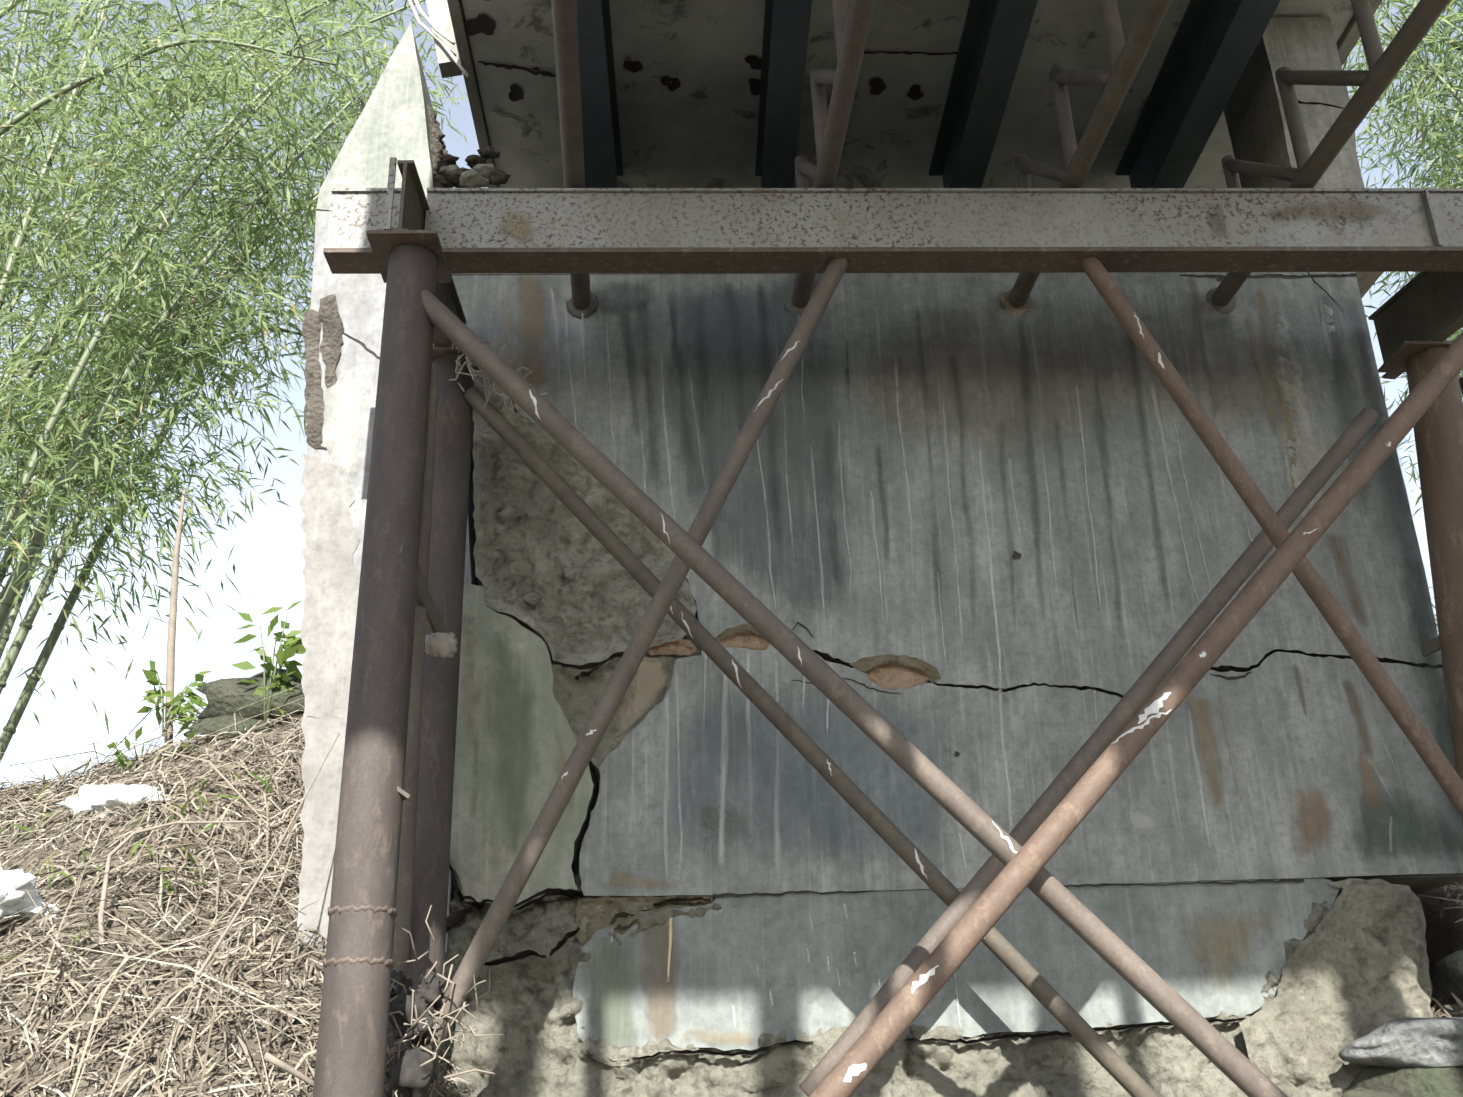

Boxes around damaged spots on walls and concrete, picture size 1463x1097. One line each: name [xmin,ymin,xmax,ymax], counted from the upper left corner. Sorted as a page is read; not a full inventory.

peeling [297,294,360,952]
spalling [472,384,675,741]
crack [575,655,623,681]
spalling [591,579,697,769]
damp [682,288,801,492]
damp [721,330,844,597]
crack [792,622,1152,698]
crack [1210,649,1443,680]
crack [446,765,599,966]
spalling [576,895,713,948]
spalling [1239,878,1433,1097]